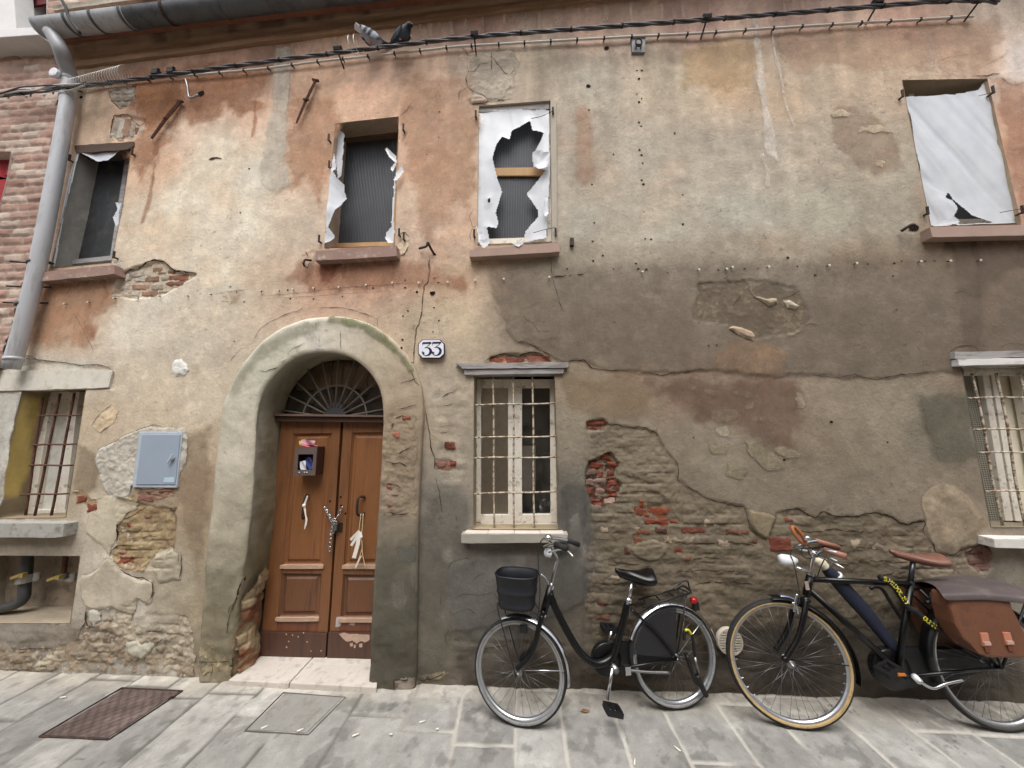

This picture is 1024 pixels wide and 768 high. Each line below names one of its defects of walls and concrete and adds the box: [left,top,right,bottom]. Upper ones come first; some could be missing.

damp [753,18,781,158]
flaking render [112,259,196,299]
crack [217,257,430,385]
flaking render [483,352,550,363]
crack [516,258,718,376]
flaking render [693,268,818,341]
crack [817,372,929,380]
flaking render [72,489,101,512]
flaking render [110,489,182,598]
crack [425,392,454,511]
flaking render [582,419,993,650]
flaking render [0,566,269,678]